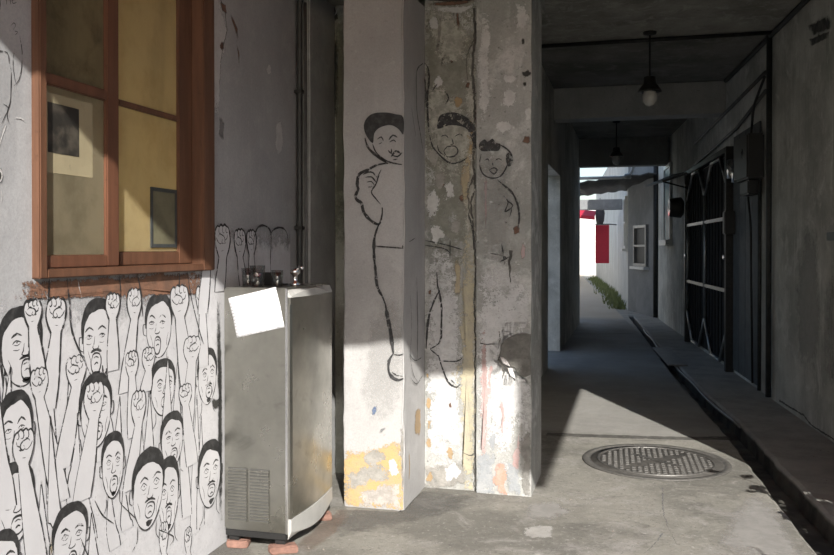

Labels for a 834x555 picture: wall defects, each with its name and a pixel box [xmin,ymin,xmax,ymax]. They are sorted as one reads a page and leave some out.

peeling [344,429,410,510]
peeling [415,0,531,495]